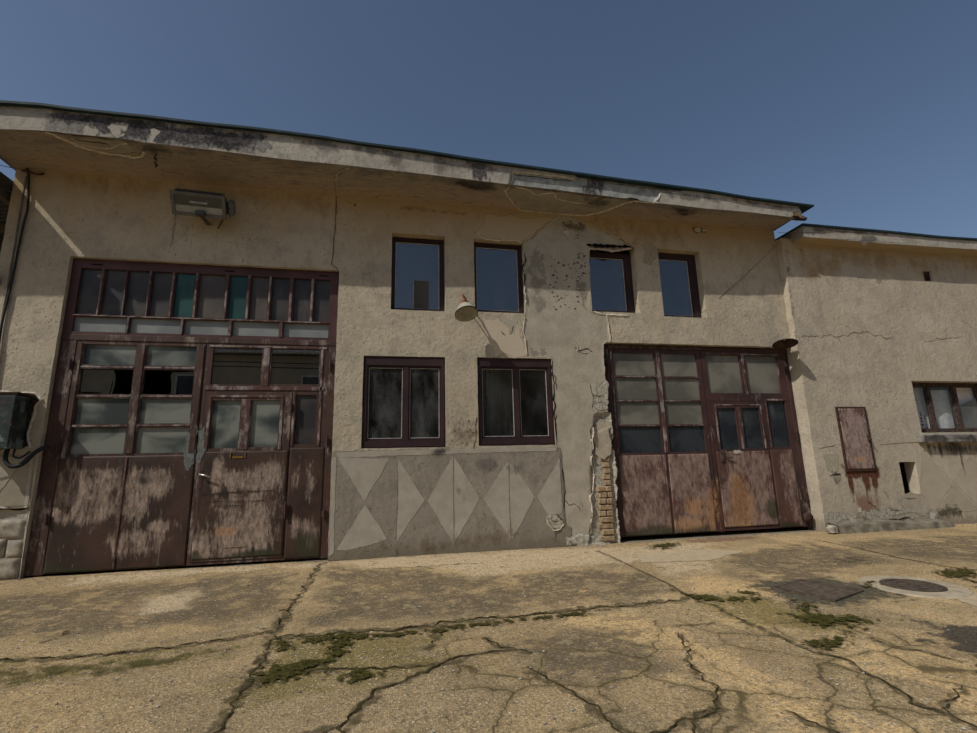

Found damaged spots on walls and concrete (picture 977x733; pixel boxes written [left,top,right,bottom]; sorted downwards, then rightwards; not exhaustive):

damp [44,110,272,153]
crack [330,196,339,272]
flaking render [478,171,683,546]
damp [925,434,977,464]
corrosion [842,465,879,518]